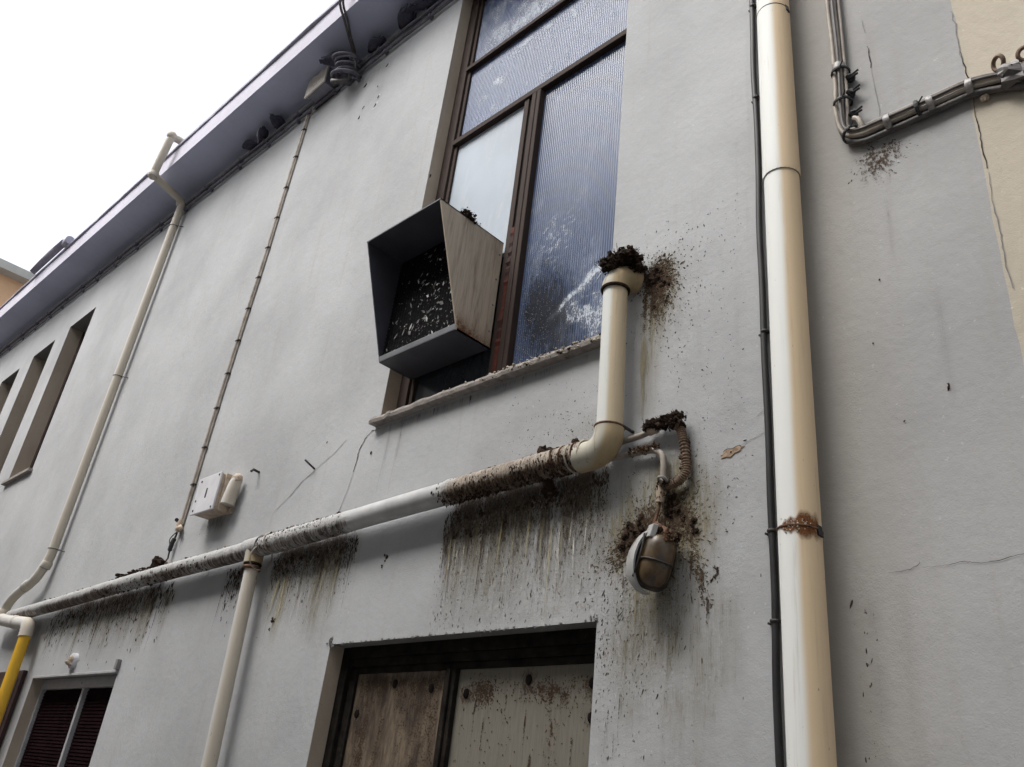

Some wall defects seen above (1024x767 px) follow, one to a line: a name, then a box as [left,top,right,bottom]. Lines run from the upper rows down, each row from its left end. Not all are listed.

crack [950,11,969,78]
crack [974,107,1014,288]
damp [43,580,175,666]
damp [264,531,359,632]
damp [430,449,745,767]